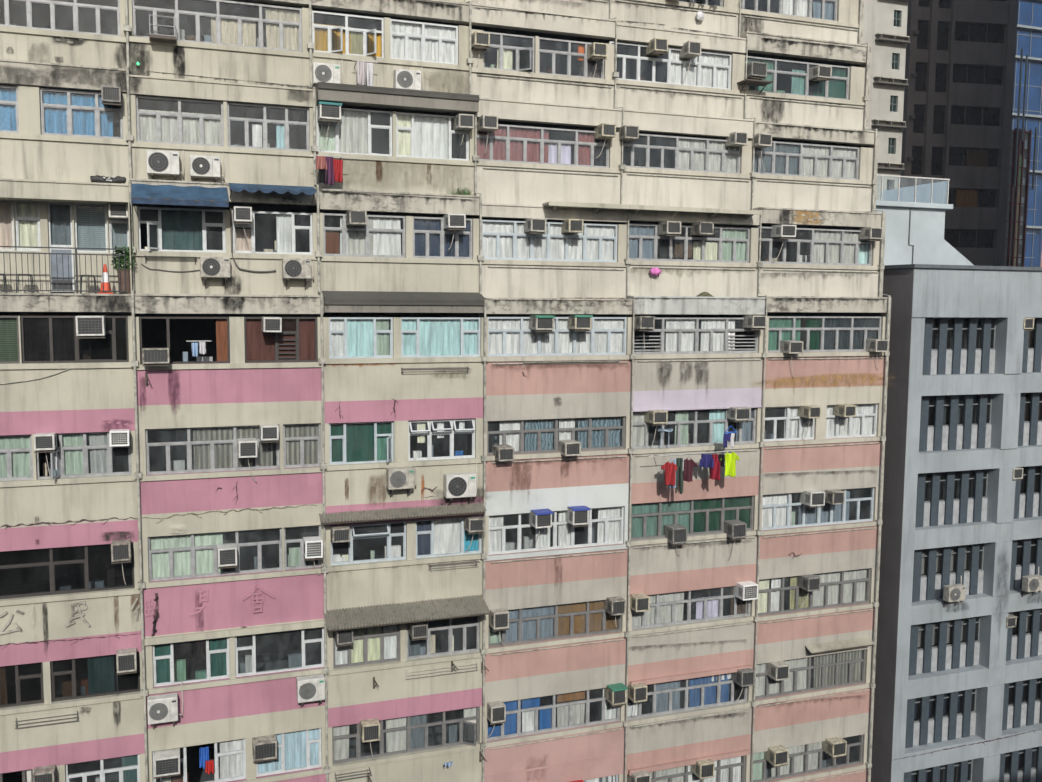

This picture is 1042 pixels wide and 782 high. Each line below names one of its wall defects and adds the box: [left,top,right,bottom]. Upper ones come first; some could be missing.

damp [117,35,237,91]
rust [775,374,883,386]
crack [1,481,317,529]
crack [0,593,159,648]